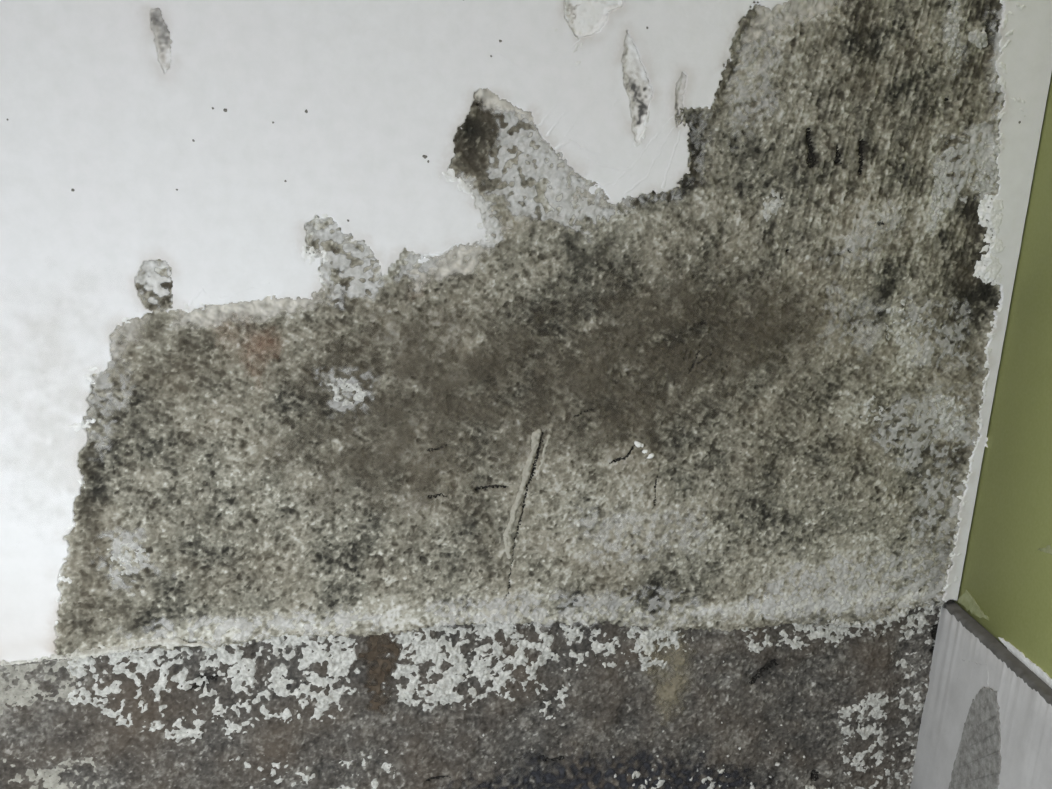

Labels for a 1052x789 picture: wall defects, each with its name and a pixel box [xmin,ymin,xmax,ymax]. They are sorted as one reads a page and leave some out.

water stain [308,366,416,489]
water stain [395,331,540,491]
flaking render [54,0,1014,656]
water stain [524,286,792,440]
crack [475,429,551,596]
water stain [358,633,400,714]
spalling [0,604,941,789]
water stain [462,751,772,789]